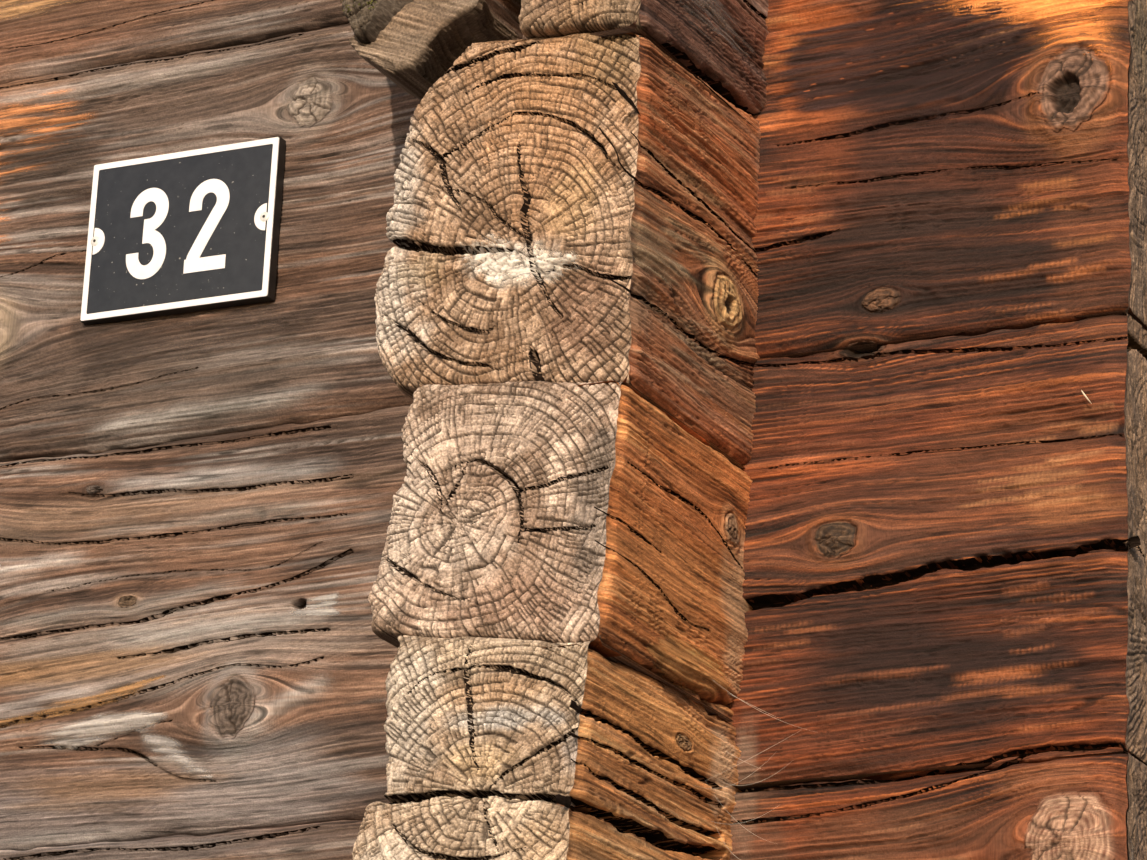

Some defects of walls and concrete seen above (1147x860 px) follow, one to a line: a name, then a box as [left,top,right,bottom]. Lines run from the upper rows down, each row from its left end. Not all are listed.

crack [393,42,1147,367]
crack [1,425,331,468]
crack [0,513,354,639]
crack [69,474,354,497]
crack [382,553,478,604]
crack [414,456,744,632]
crack [745,536,1145,611]
crack [0,628,330,782]
crack [379,644,1136,860]
crack [0,826,320,860]